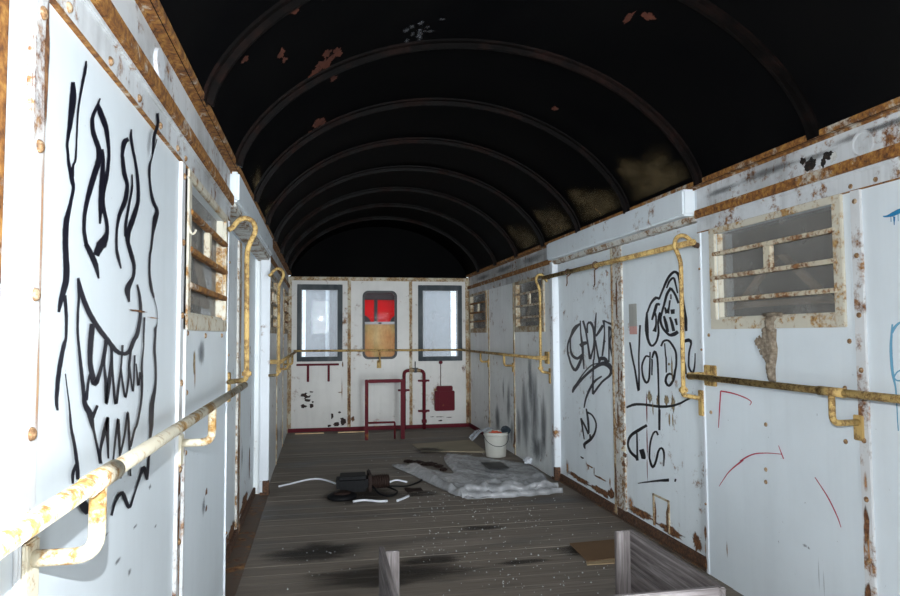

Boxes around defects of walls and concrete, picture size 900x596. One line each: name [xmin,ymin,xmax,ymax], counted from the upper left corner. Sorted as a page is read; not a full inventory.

peeling [623,11,656,24]
peeling [308,47,343,82]
rust [44,0,189,169]
water stain [620,159,677,193]
water stain [571,191,610,216]
rust [697,177,900,233]
peeling [301,391,314,408]
water stain [511,365,545,456]
rust [629,499,707,569]